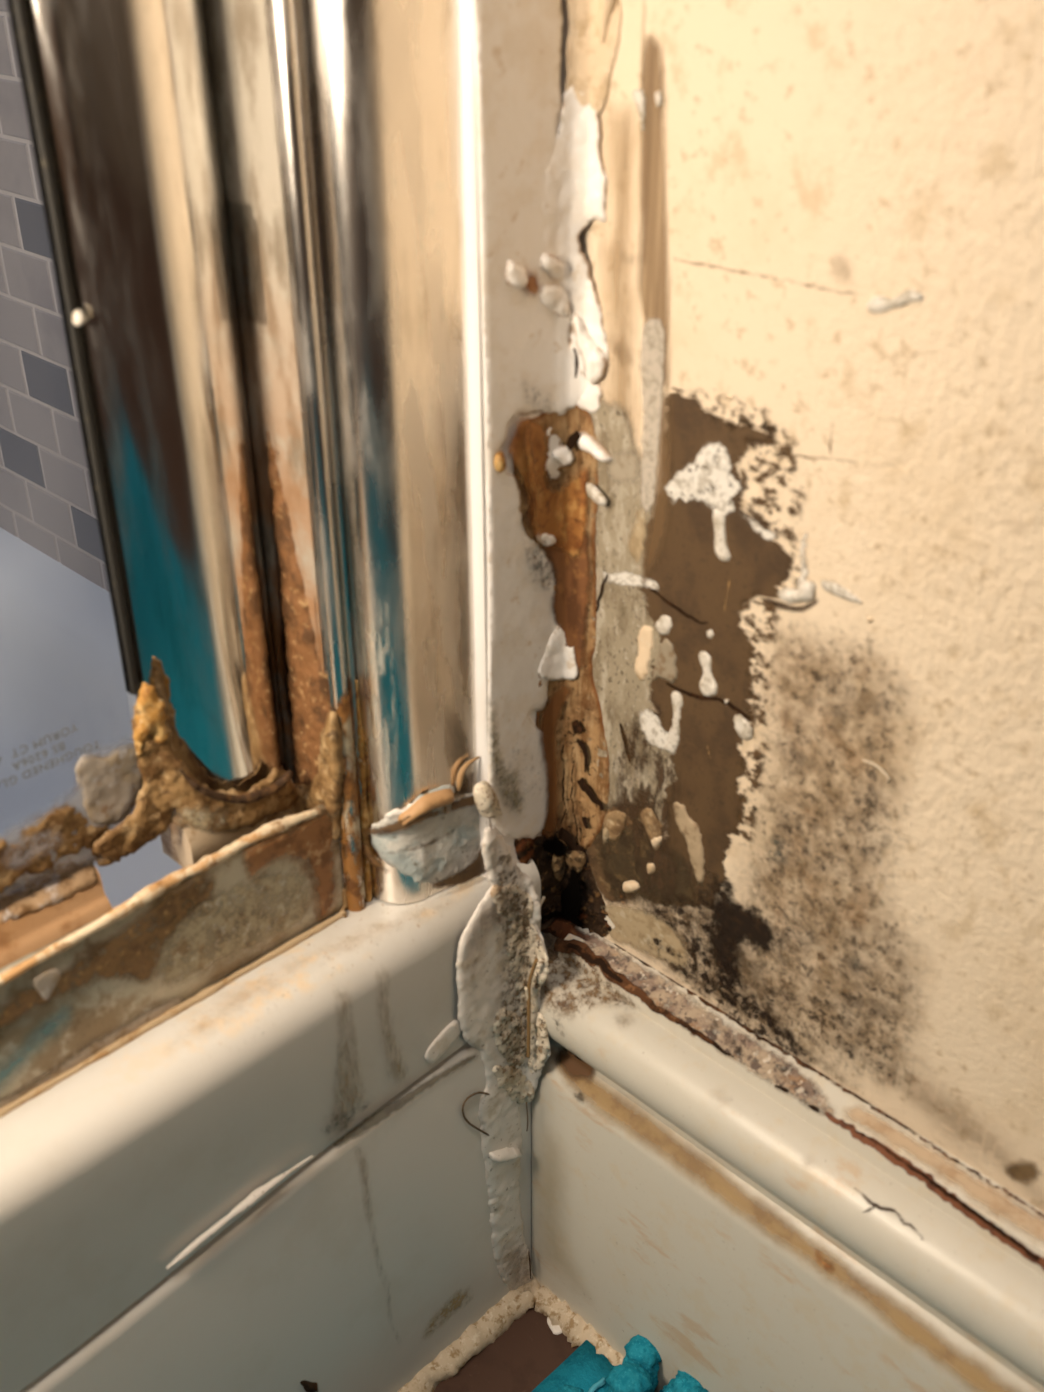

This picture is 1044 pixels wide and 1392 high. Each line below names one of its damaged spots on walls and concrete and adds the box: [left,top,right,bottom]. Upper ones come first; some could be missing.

corrosion [245,431,372,919]
peeling [472,0,804,910]
corrosion [0,877,215,1028]
corrosion [545,919,590,941]
water stain [483,646,1044,1240]
crack [554,938,1044,1270]